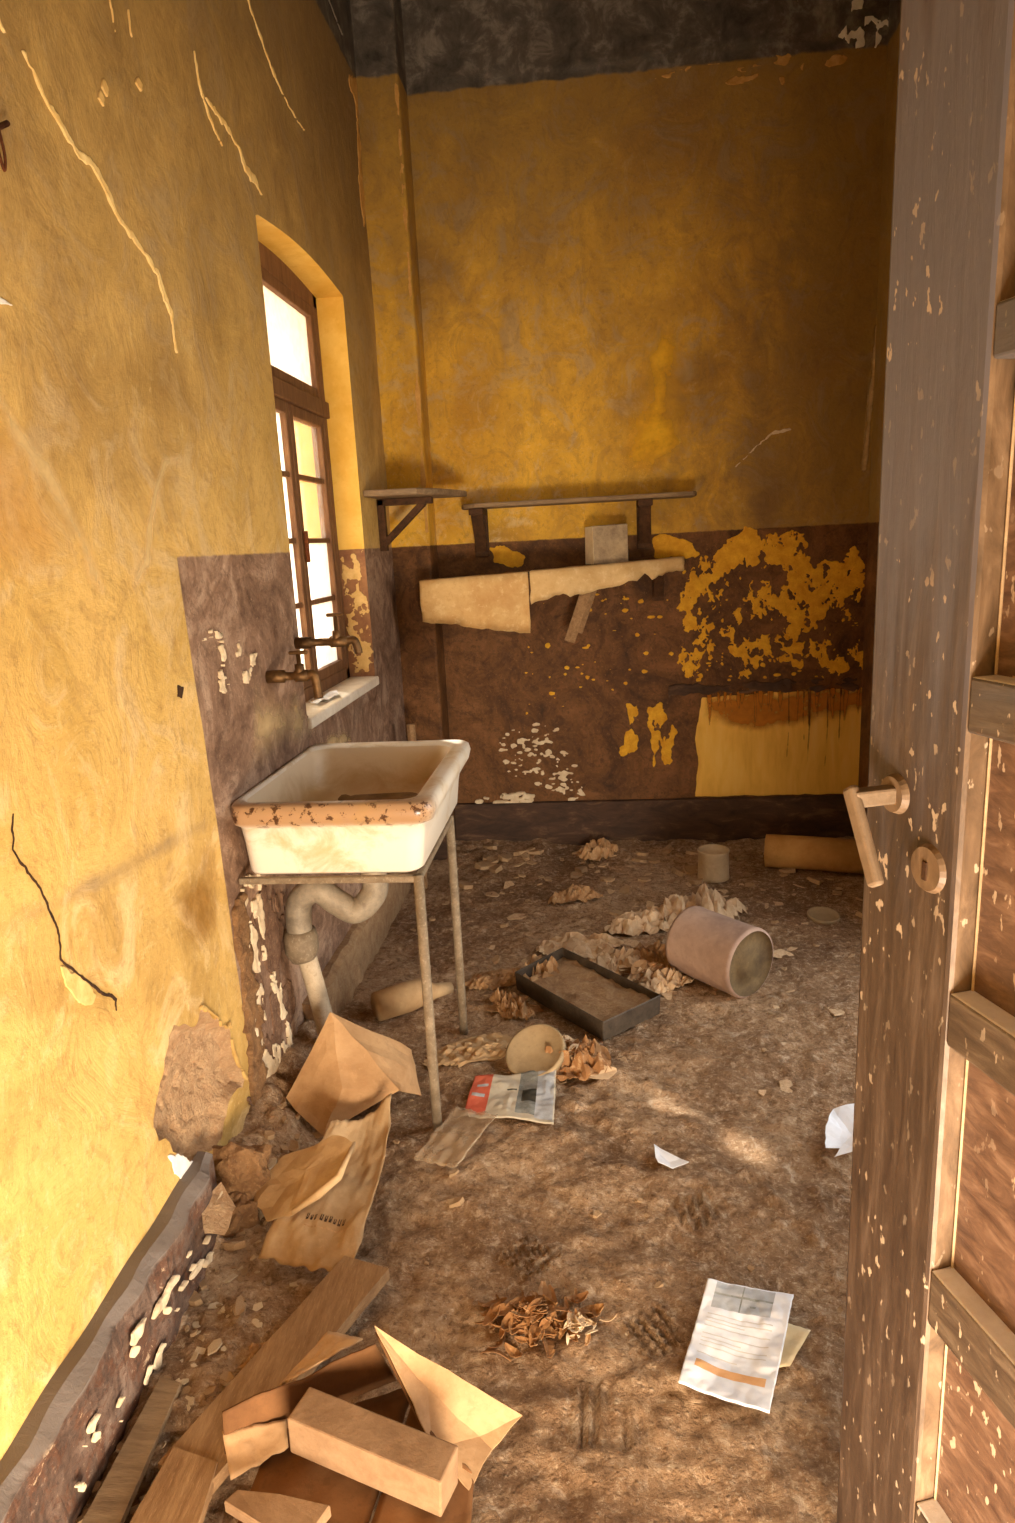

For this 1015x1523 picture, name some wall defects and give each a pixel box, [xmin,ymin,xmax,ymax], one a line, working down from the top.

crack [0,19,178,353]
crack [109,0,133,37]
crack [193,51,263,195]
crack [247,0,305,131]
peeling [341,550,374,673]
peeling [525,526,865,707]
peeling [475,712,585,804]
peeling [619,702,678,767]
crack [11,813,117,1011]
spalling [153,874,296,1179]
peeling [129,1235,214,1385]
peeling [82,1396,126,1447]